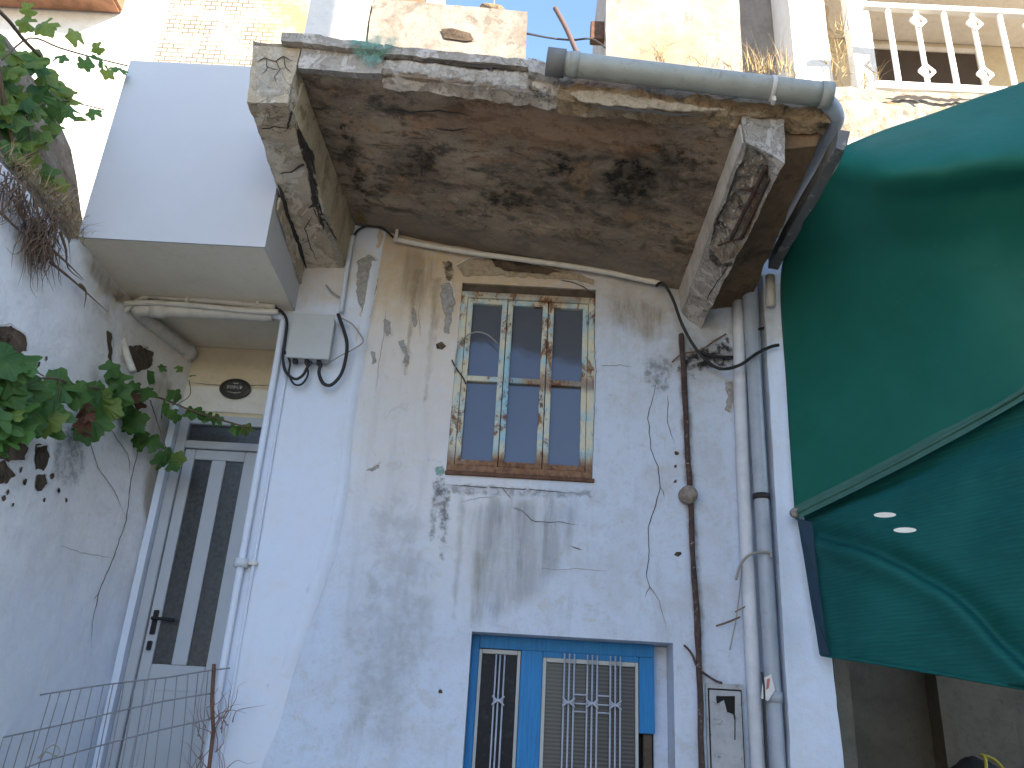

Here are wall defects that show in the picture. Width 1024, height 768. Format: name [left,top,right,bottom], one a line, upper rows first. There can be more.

crack [257,56,292,83]
crack [262,111,337,268]
mould [603,159,656,203]
spalling [709,145,771,267]
peeling [355,253,379,317]
spalling [456,257,597,286]
spalling [0,323,29,353]
spalling [128,345,155,372]
peeling [384,319,409,365]
spalling [0,442,68,507]
crack [645,382,674,625]
crack [62,431,138,647]